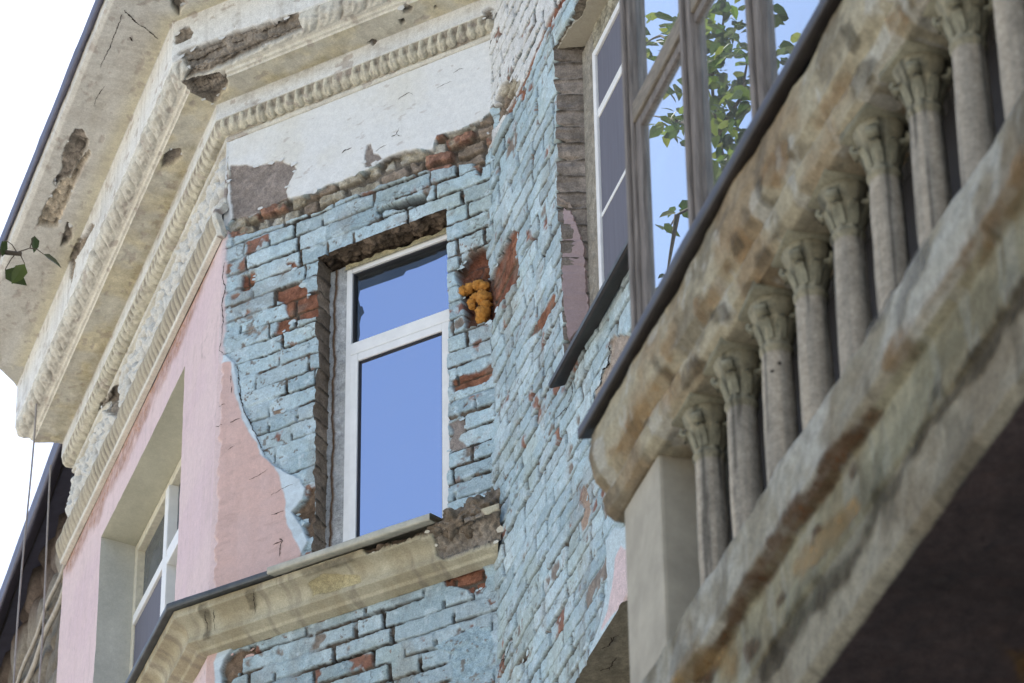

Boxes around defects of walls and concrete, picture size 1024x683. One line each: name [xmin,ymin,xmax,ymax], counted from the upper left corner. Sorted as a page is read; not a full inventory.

crack [94,10,158,105]
spalling [174,13,303,105]
spalling [161,148,182,168]
spalling [226,0,565,238]
spalling [38,128,95,284]
spalling [242,273,256,291]
spalling [276,262,320,335]
spalling [457,227,520,329]
spalling [530,198,590,342]
spalling [451,364,493,392]
spalling [447,403,468,452]
spalling [363,487,504,560]